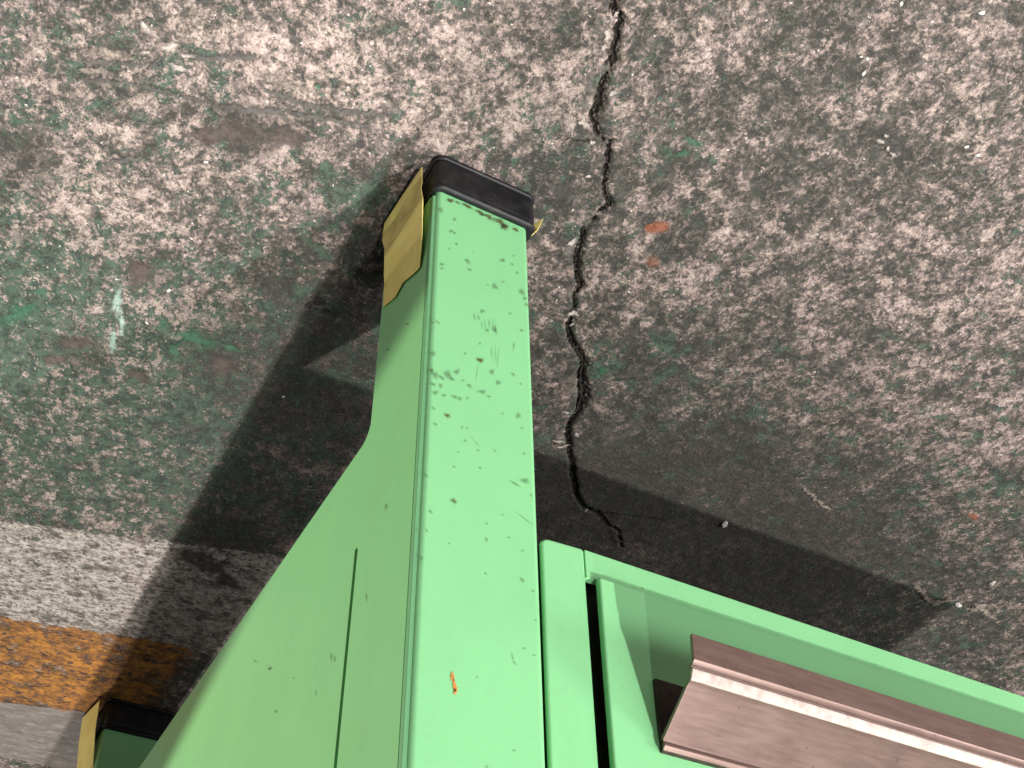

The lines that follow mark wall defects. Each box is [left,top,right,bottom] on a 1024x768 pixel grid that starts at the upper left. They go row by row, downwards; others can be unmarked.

crack [550,0,662,544]
rust [646,223,668,232]